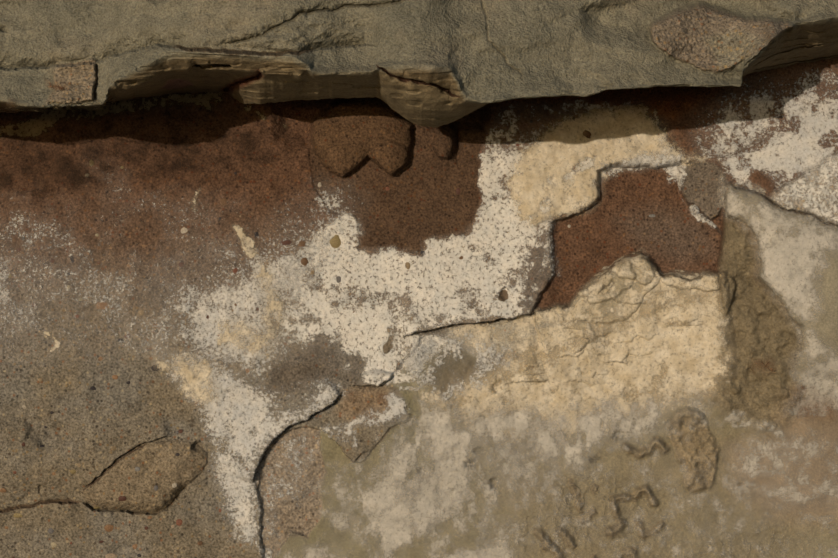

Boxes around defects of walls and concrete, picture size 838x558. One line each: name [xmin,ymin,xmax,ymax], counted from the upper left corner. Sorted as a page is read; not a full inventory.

damp [0,92,225,195]
peeling [309,103,490,255]
damp [0,214,84,341]
damp [76,69,838,558]
crack [396,307,569,372]
spalling [516,164,736,380]
crack [0,444,147,514]
crack [254,406,330,480]
crack [380,416,411,442]
spalling [666,410,720,492]